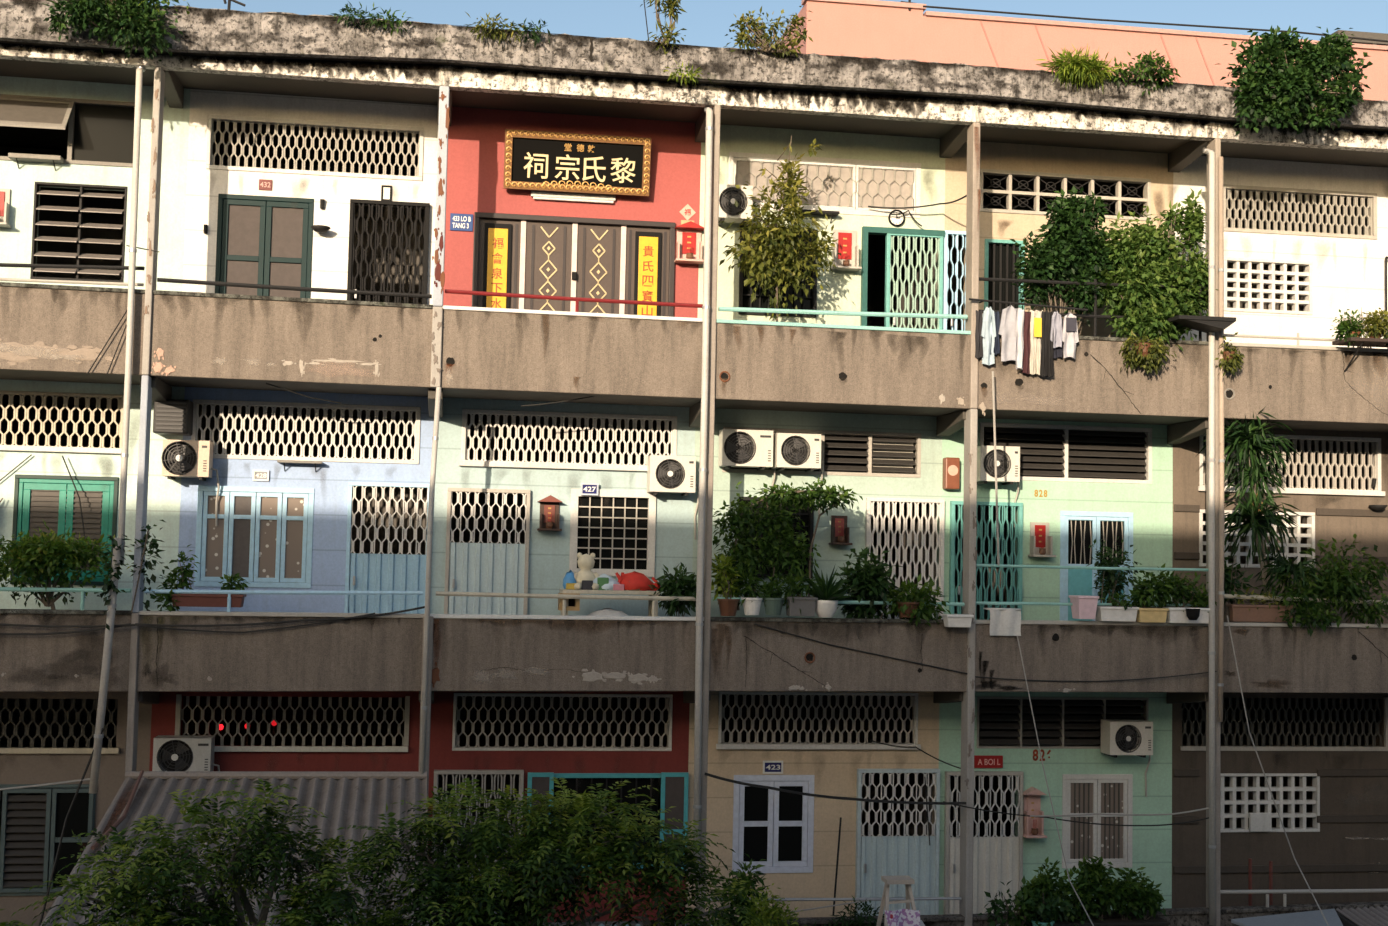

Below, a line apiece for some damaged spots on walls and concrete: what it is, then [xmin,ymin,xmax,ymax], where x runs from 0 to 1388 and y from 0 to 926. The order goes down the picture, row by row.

damp [0,0,1388,140]
spalling [0,338,116,367]
spalling [151,348,176,376]
peeling [281,358,382,377]
spalling [572,669,661,685]